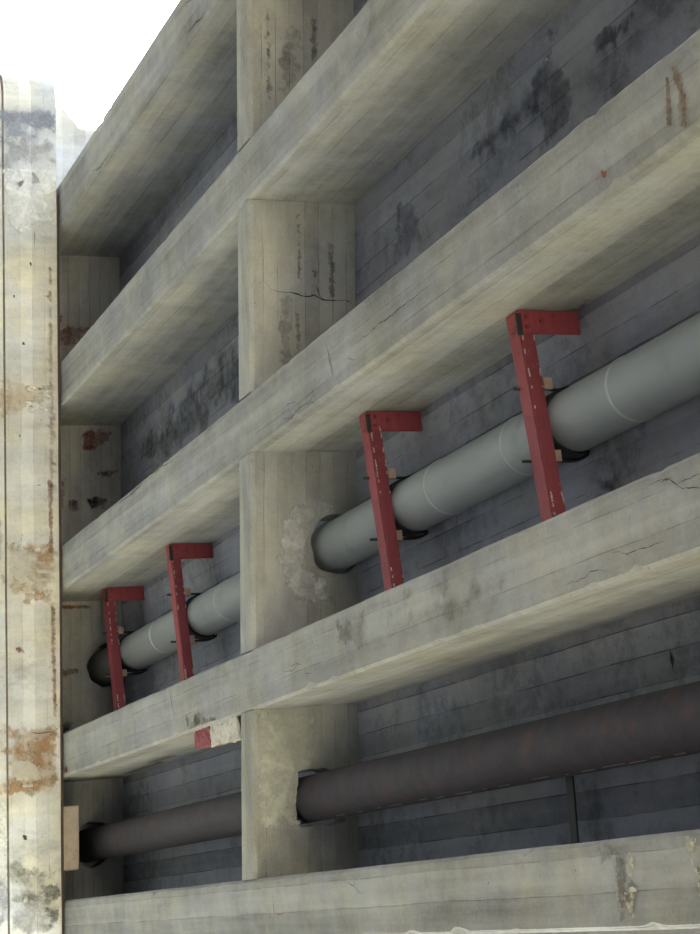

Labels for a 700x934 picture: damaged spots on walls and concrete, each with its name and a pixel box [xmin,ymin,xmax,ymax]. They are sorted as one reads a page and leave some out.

leakage [599,24,627,49]
rust [666,67,686,126]
leakage [0,110,55,138]
leakage [5,169,56,230]
crack [267,284,353,305]
crack [649,474,698,489]
rust [38,503,53,578]
spalling [187,715,241,748]
rust [5,728,68,796]
leakage [26,885,60,930]